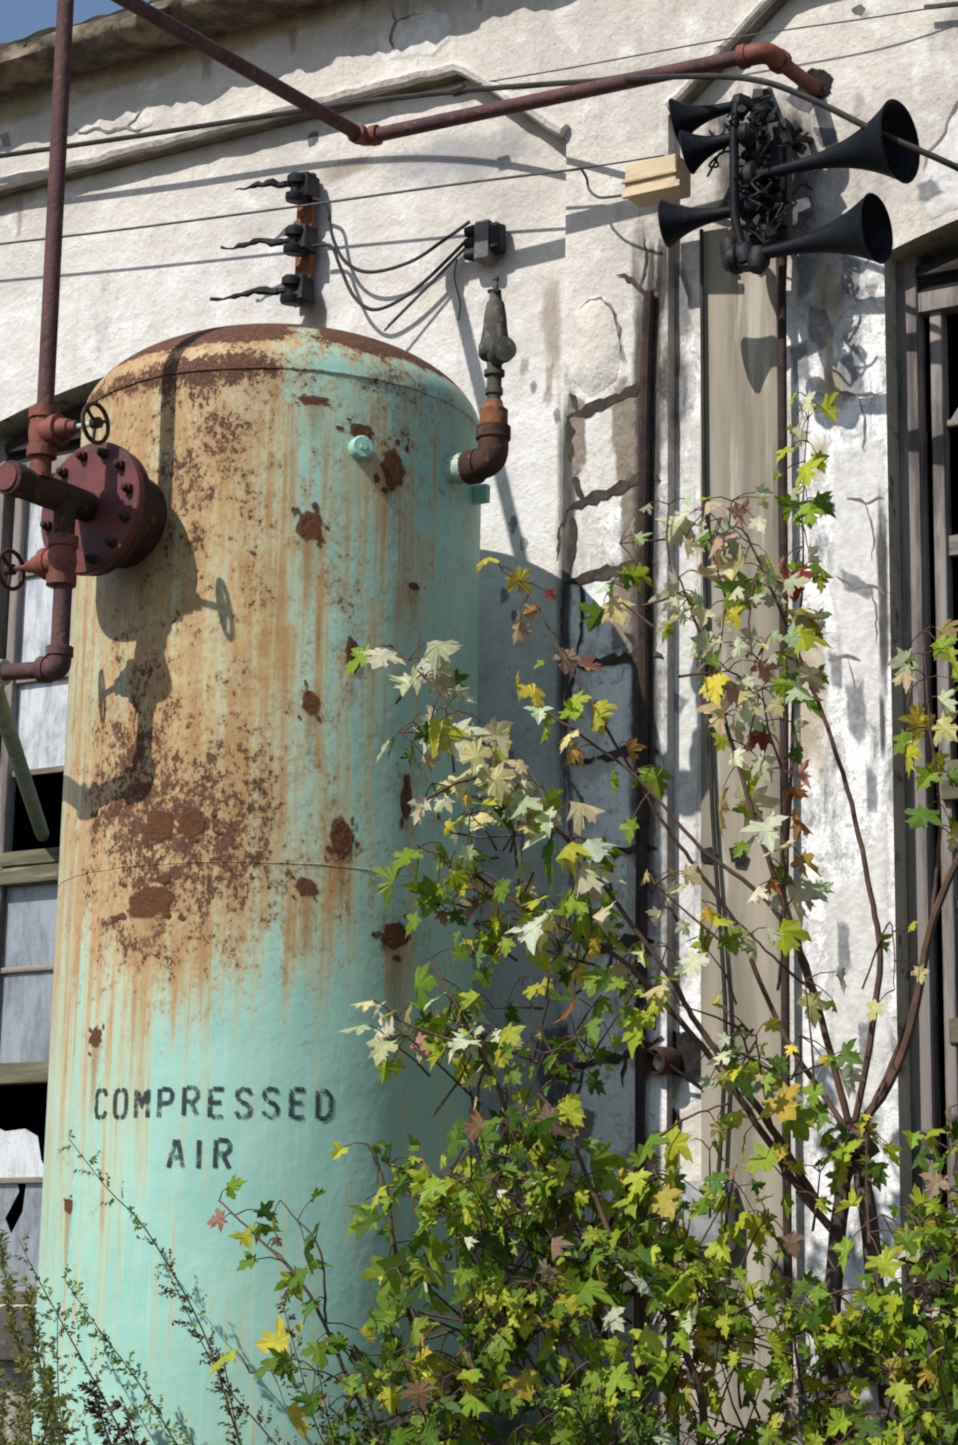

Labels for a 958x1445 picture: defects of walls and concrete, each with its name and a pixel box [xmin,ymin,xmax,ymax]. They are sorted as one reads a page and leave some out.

peeling [390,10,452,58]
peeling [917,101,958,217]